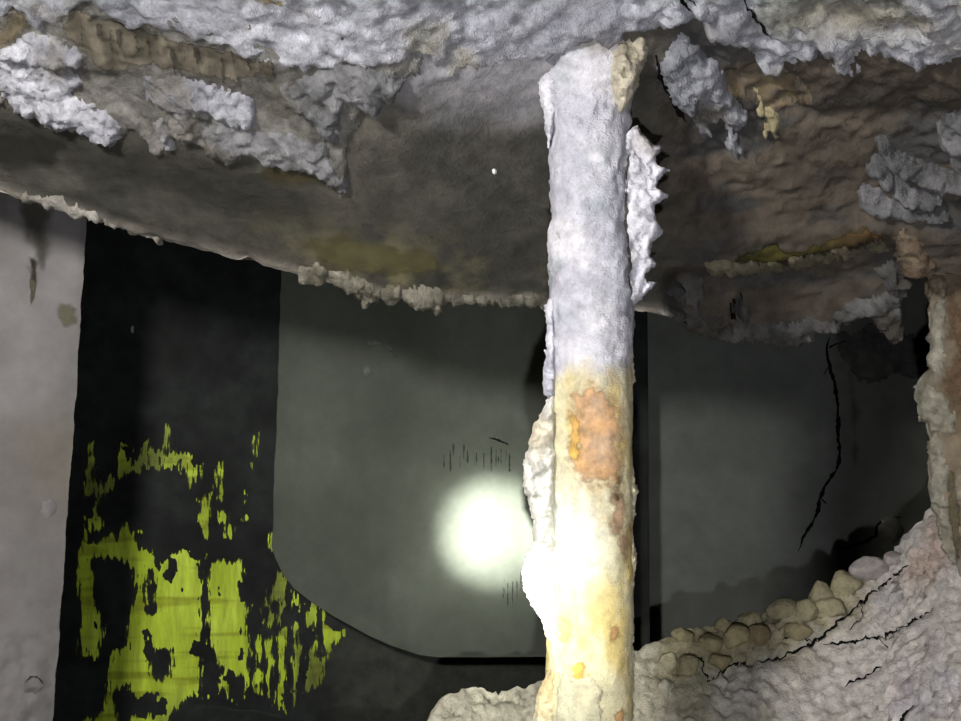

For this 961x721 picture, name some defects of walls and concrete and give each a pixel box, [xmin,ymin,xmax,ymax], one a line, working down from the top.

peeling [0,9,407,199]
leakage [0,0,961,194]
crack [680,0,697,12]
crack [744,0,772,40]
rust [569,387,629,560]
crack [798,337,846,552]
crack [697,565,934,688]